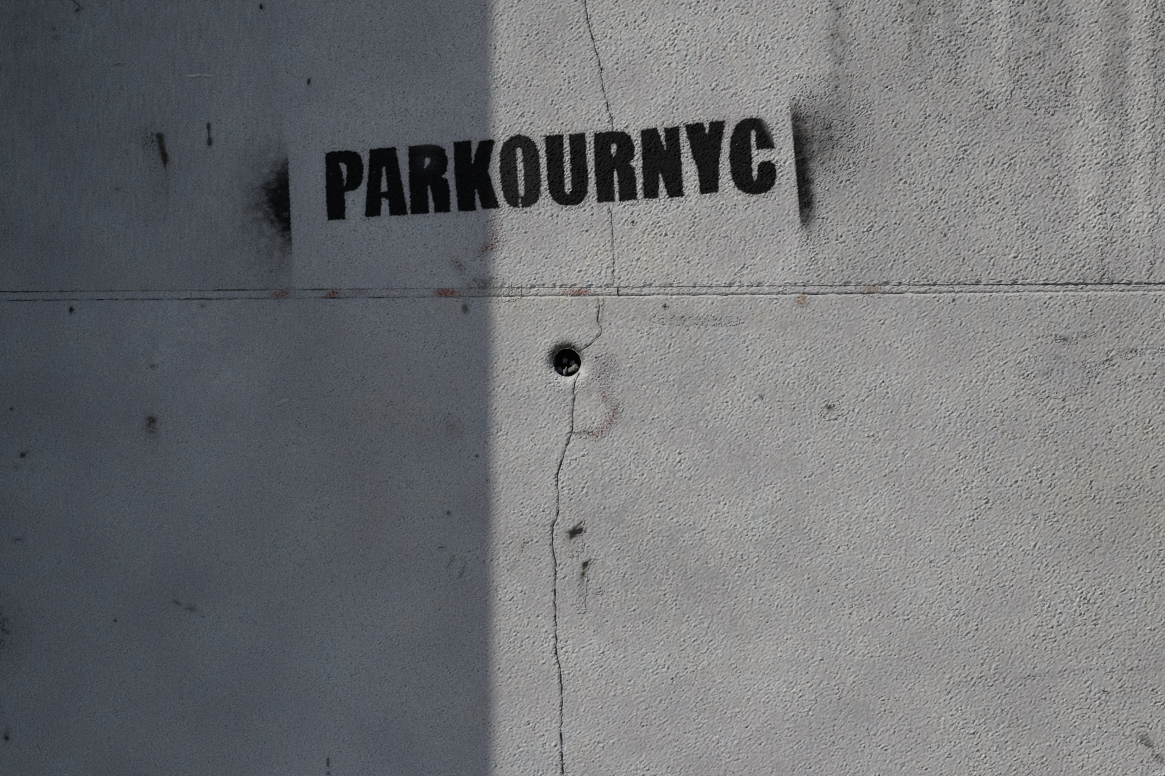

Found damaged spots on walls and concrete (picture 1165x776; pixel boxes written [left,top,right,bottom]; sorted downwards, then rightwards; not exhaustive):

crack [582,0,614,154]
crack [507,204,621,776]